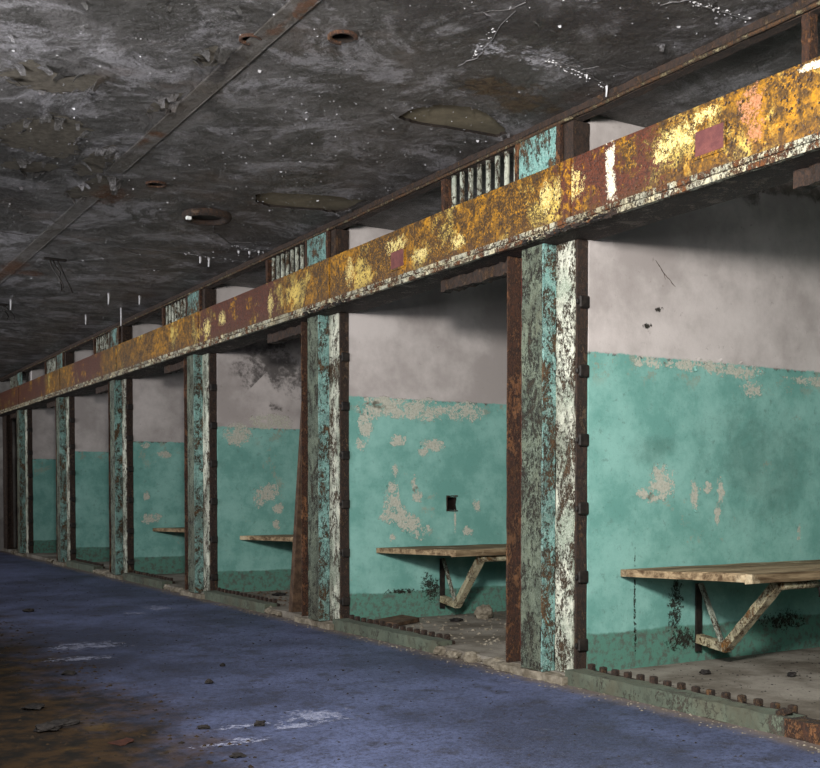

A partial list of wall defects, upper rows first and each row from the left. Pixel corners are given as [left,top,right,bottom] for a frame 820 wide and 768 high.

corrosion [328,30,358,45]
crack [458,0,526,66]
peeling [0,60,114,95]
crack [545,59,609,88]
corrosion [737,82,766,147]
peeling [0,108,134,204]
corrosion [182,208,232,226]
corrosion [522,207,618,245]
peeling [631,355,763,398]
peeling [355,396,485,451]
peeling [379,464,431,541]
water stain [666,579,695,651]